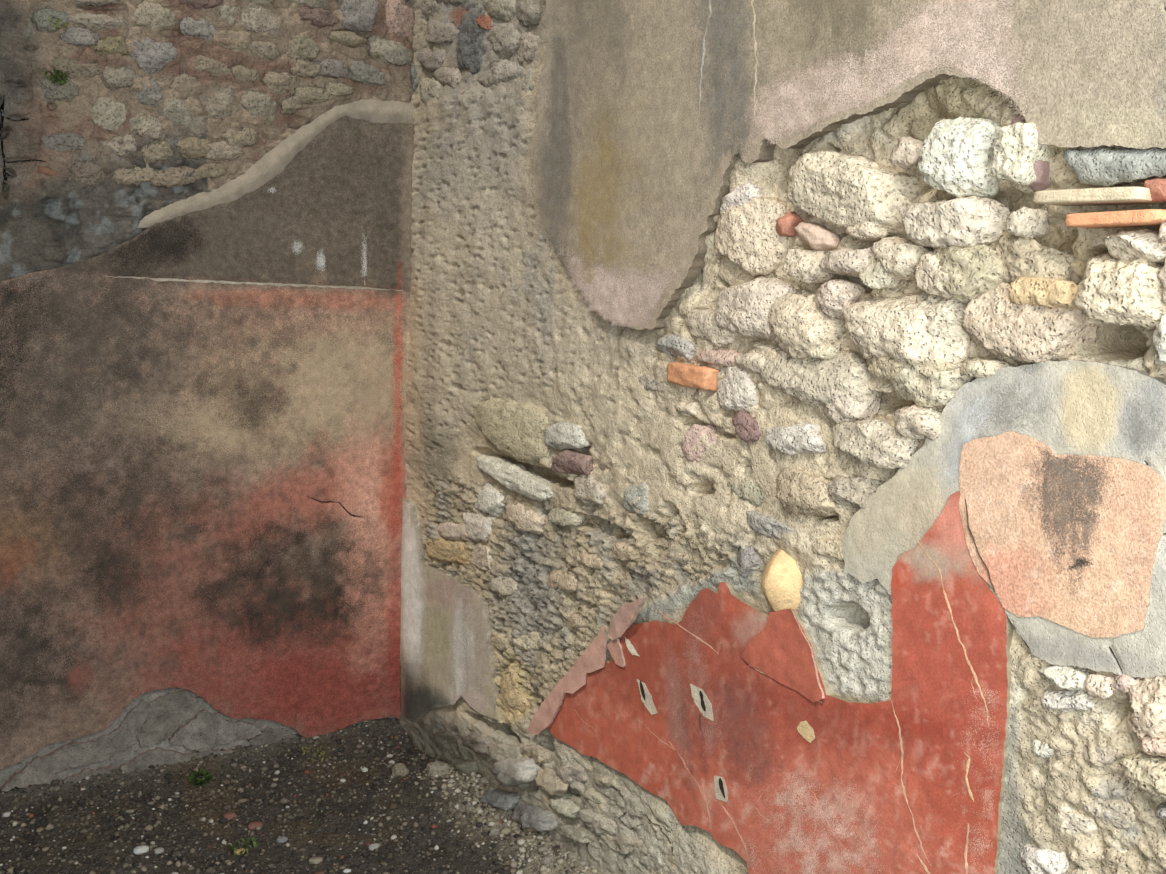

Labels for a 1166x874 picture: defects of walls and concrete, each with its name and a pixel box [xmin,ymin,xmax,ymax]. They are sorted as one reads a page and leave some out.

spalling [22,0,542,215]
leakage [0,240,482,736]
crack [308,497,363,518]
spalling [419,0,1166,874]
leakage [932,373,1128,602]
crack [917,540,989,726]
crack [891,700,974,874]